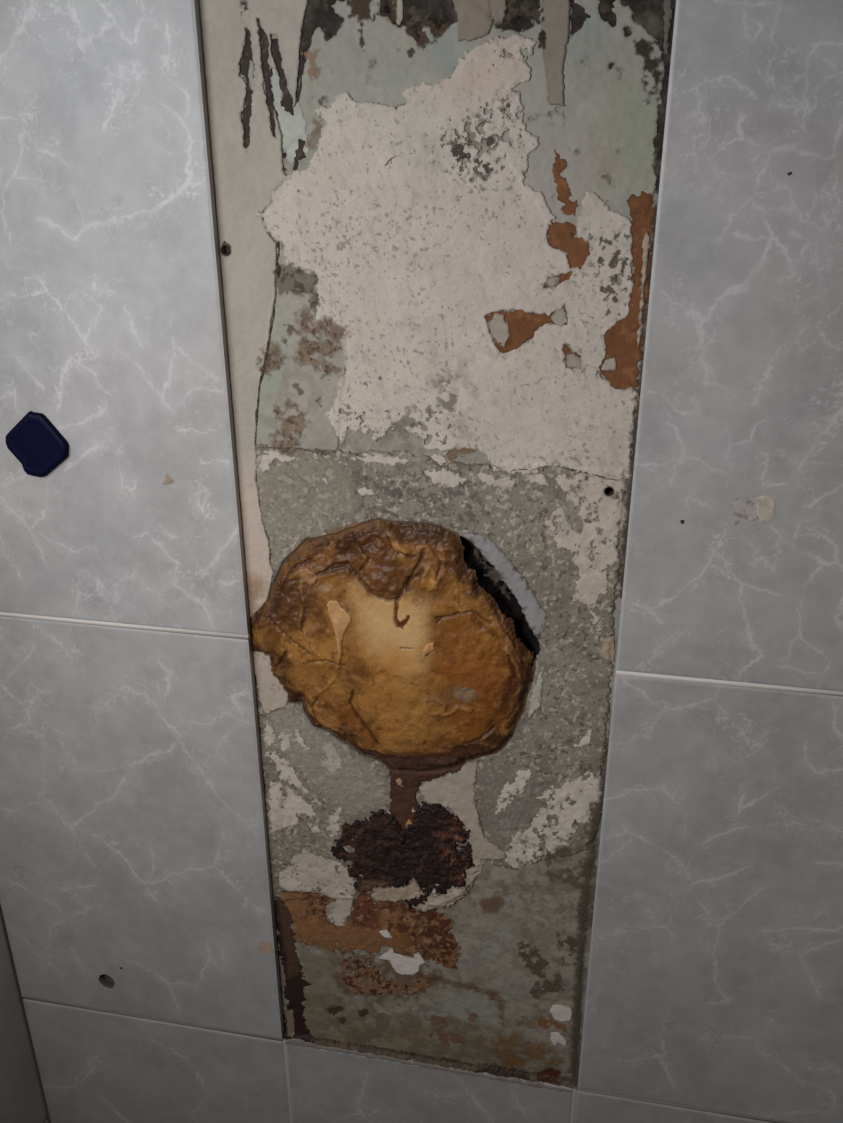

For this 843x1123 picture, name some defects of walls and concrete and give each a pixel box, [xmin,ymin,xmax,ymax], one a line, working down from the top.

peeling [198,0,665,618]
peeling [327,600,351,656]
flaking render [253,651,343,838]
peeling [573,729,592,750]
rust [277,890,461,998]
peeling [279,762,596,1078]